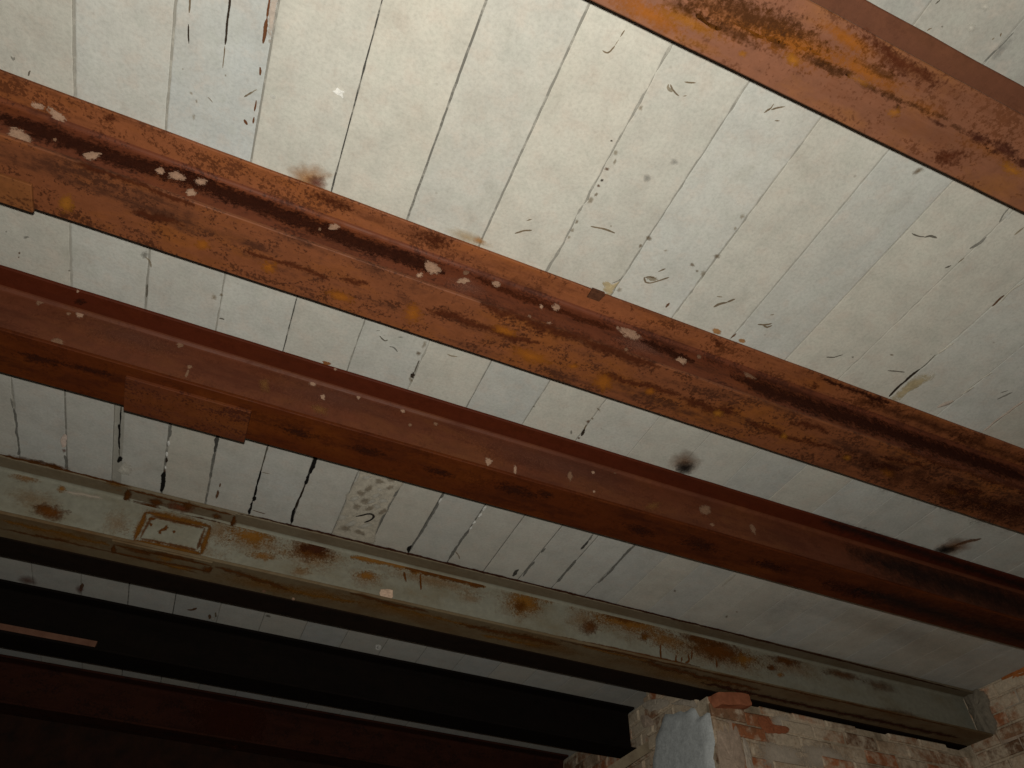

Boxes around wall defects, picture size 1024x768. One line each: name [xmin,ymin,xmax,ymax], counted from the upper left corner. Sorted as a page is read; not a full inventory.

crack [223,0,231,64]
rust [973,132,1024,174]
rust [0,114,445,274]
rust [247,251,368,301]
rust [406,277,654,366]
rust [594,373,735,417]
rust [730,375,1024,481]
crack [208,453,216,478]
rust [0,454,960,738]
peeling [641,698,754,768]
spalling [758,716,789,734]